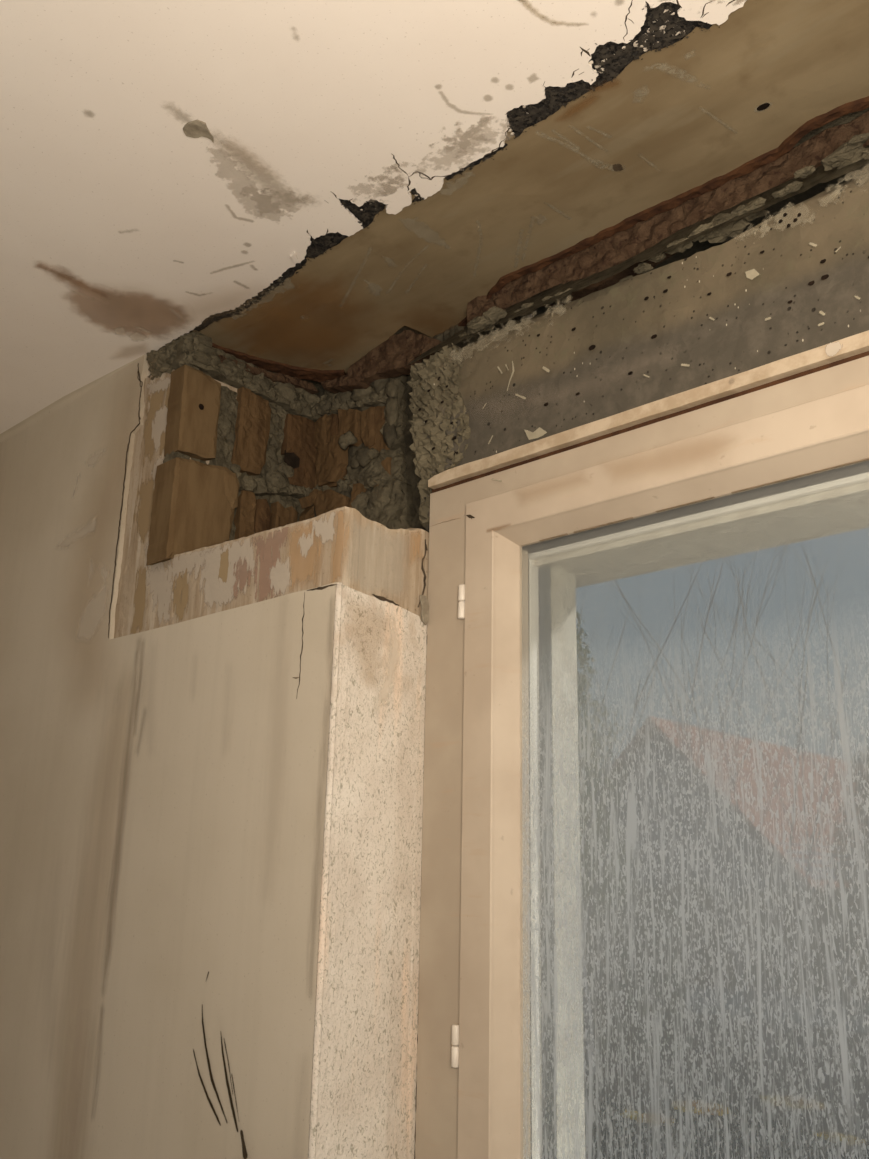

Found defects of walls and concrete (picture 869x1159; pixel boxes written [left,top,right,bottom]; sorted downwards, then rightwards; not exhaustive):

peeling [183,120,214,143]
spalling [392,0,720,205]
spalling [327,191,388,229]
spalling [194,229,348,332]
peeling [131,376,349,634]
flaking render [420,595,429,625]